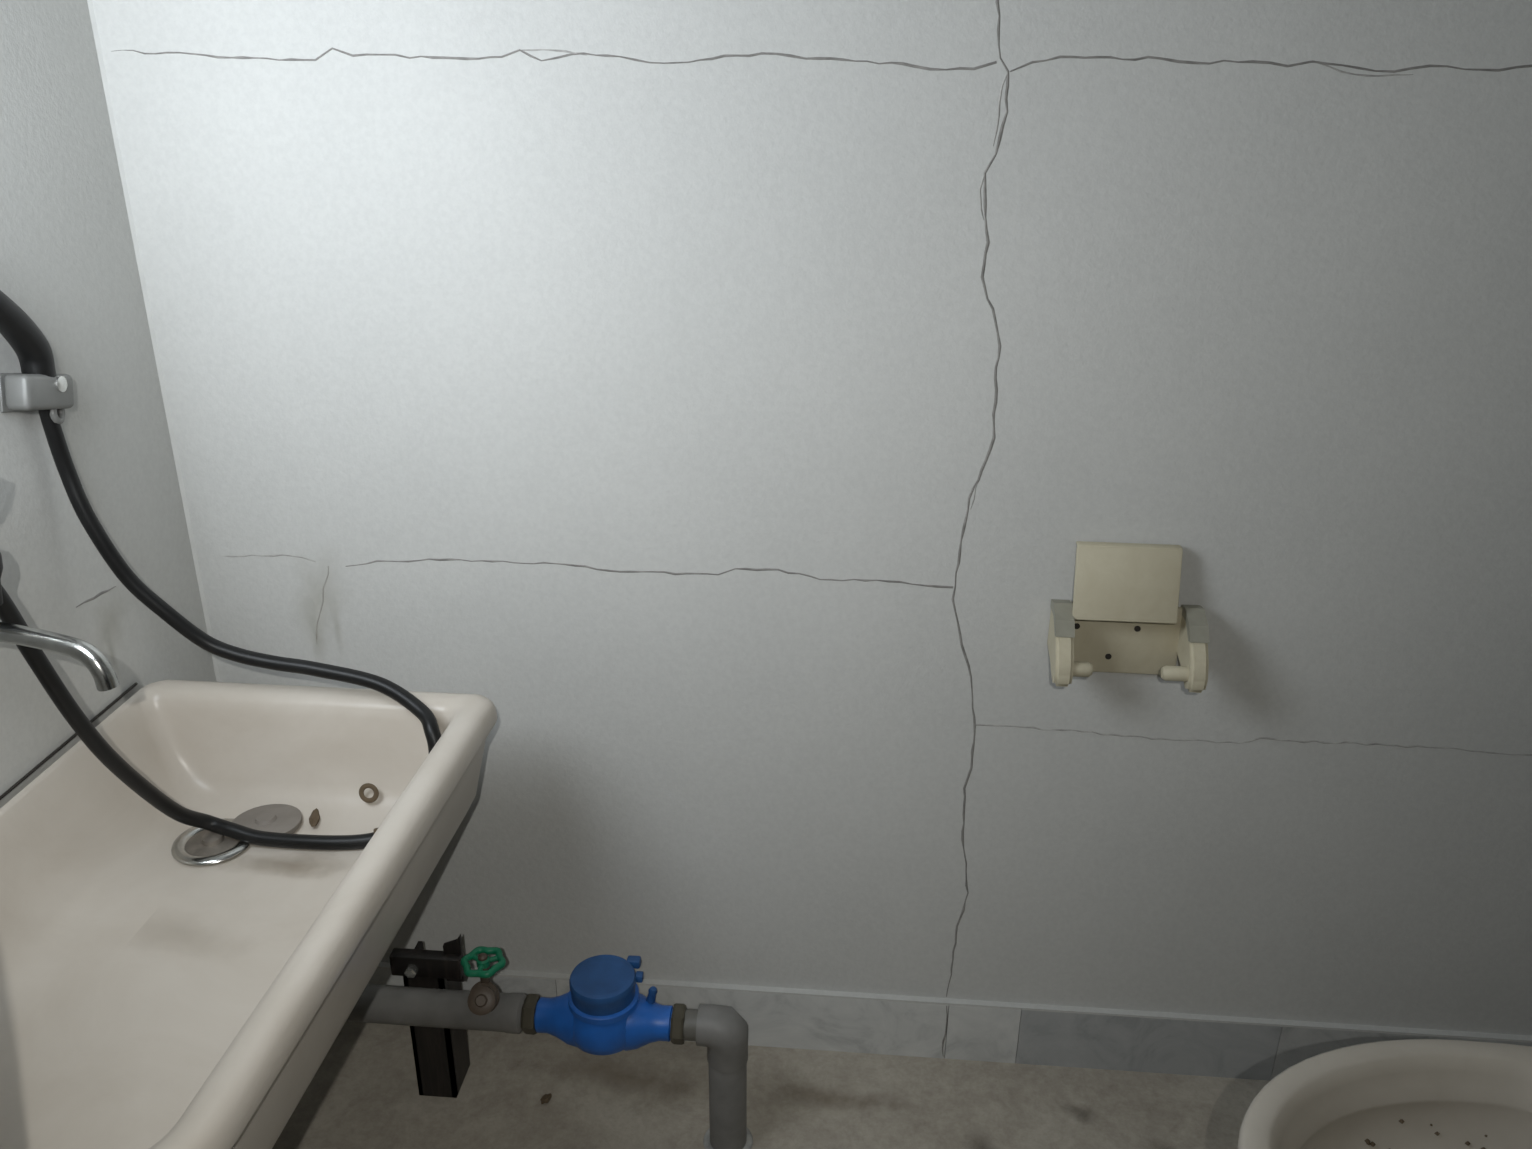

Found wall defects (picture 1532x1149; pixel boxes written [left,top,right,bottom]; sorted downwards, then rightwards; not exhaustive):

crack [111,47,997,71]
crack [346,0,1532,997]
crack [76,586,116,608]
crack [226,554,329,644]
crack [941,1006,949,1056]